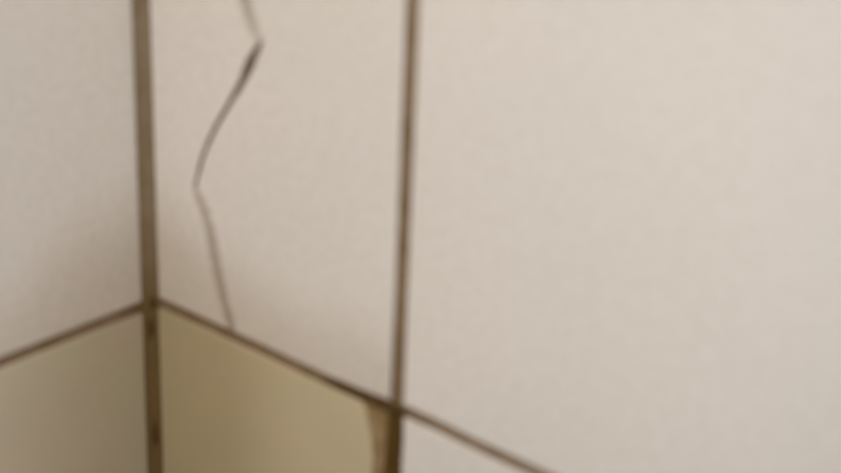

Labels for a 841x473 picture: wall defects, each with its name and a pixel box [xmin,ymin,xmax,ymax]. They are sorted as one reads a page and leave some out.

crack [194,40,263,187]